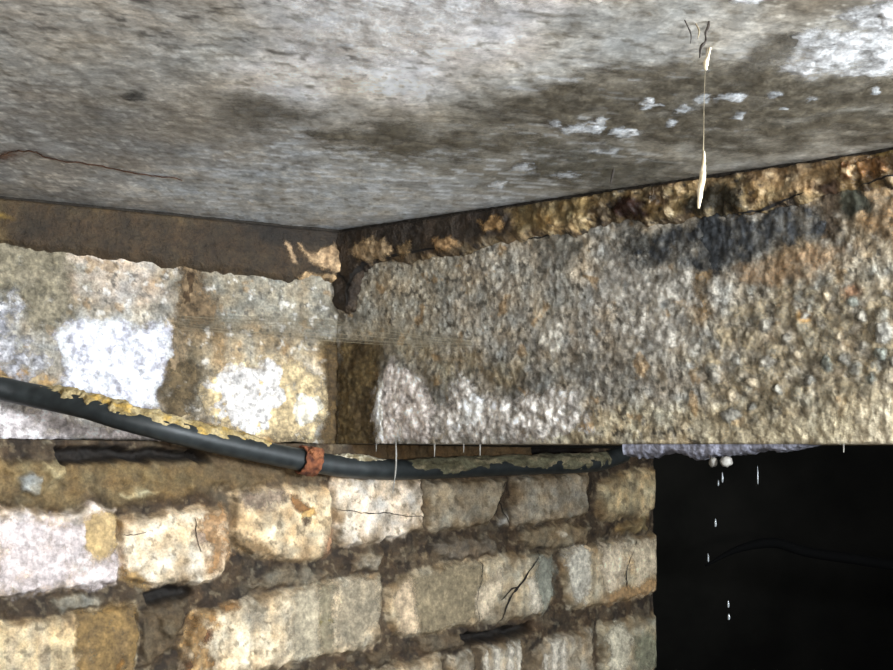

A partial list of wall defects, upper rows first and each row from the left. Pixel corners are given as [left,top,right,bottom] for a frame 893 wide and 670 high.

water stain [122,92,144,101]
water stain [296,0,893,190]
spalling [837,158,886,181]
crack [861,175,893,186]
crack [737,192,804,214]
peeling [480,215,504,231]
peeling [351,237,410,262]
peeling [432,236,458,253]
peeling [286,242,341,283]
water stain [596,180,873,349]
crack [477,551,540,621]